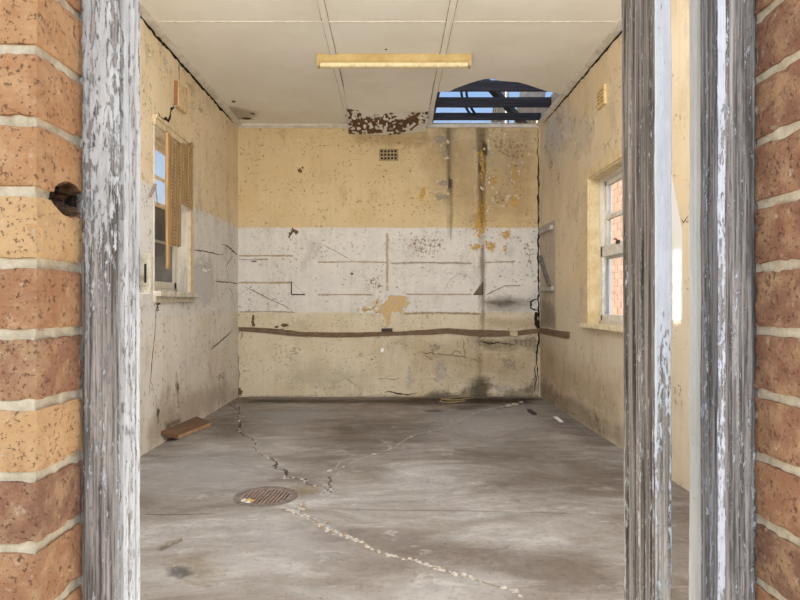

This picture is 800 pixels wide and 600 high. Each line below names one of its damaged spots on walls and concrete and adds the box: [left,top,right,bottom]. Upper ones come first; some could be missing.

crack [140,16,233,123]
peeling [345,109,429,135]
peeling [470,133,537,283]
peeling [357,276,410,328]
crack [220,30,622,597]